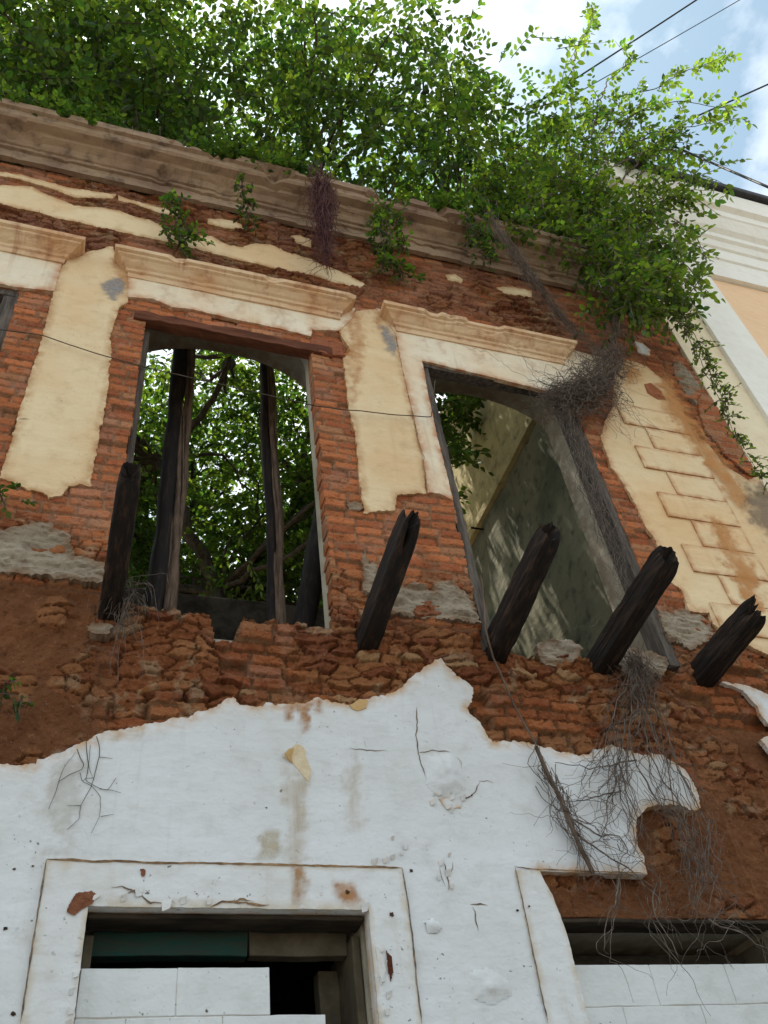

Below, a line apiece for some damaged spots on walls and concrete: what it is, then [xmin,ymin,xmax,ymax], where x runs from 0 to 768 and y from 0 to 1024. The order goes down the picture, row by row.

spalling [0,161,756,570]
spalling [0,287,768,930]
crack [415,709,491,798]
crack [20,858,422,1023]
rust [335,884,357,901]